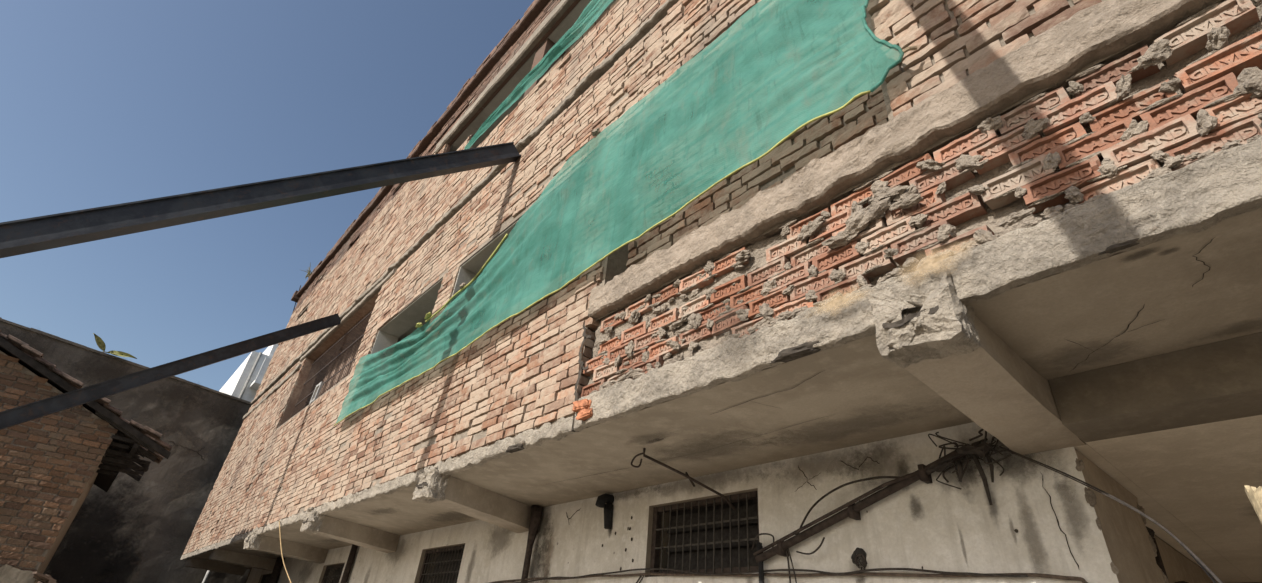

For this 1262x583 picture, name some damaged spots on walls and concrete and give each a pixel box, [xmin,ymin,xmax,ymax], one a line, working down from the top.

spalling [572,0,1262,421]
crack [1192,237,1215,288]
crack [1067,304,1161,372]
spalling [412,466,452,504]
spalling [243,530,265,550]
spalling [300,507,325,535]